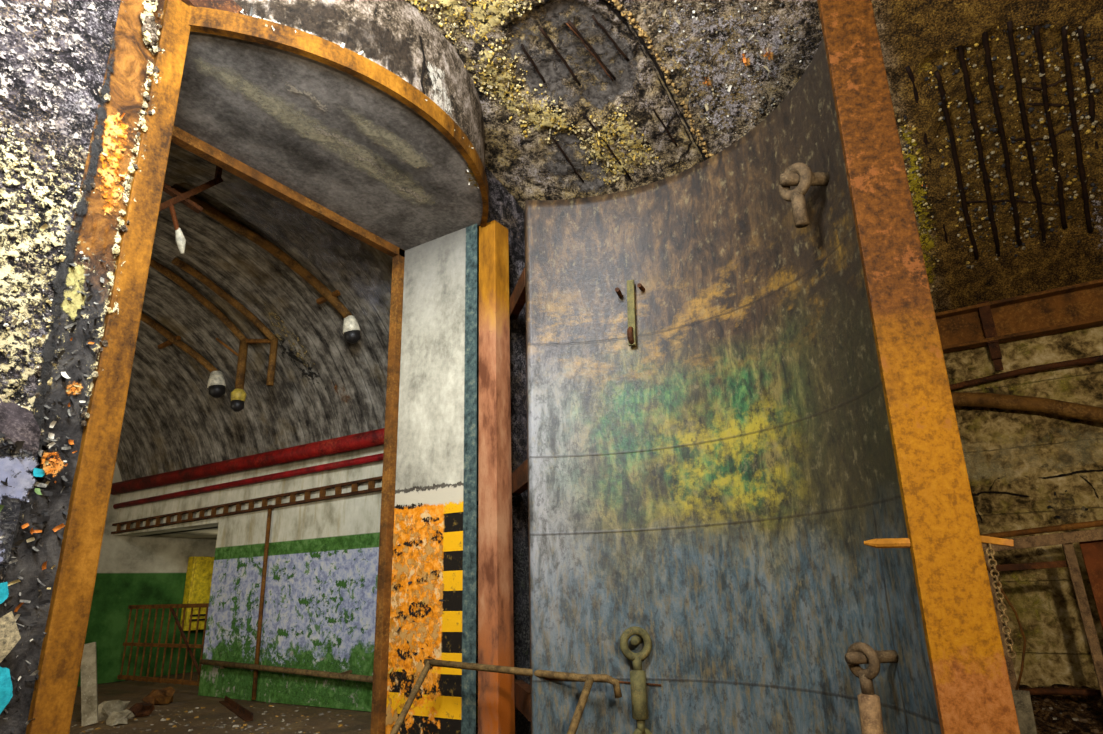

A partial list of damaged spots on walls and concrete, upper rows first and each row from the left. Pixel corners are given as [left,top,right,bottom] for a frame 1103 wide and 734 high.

peeling [217,544,366,710]
peeling [386,503,445,726]